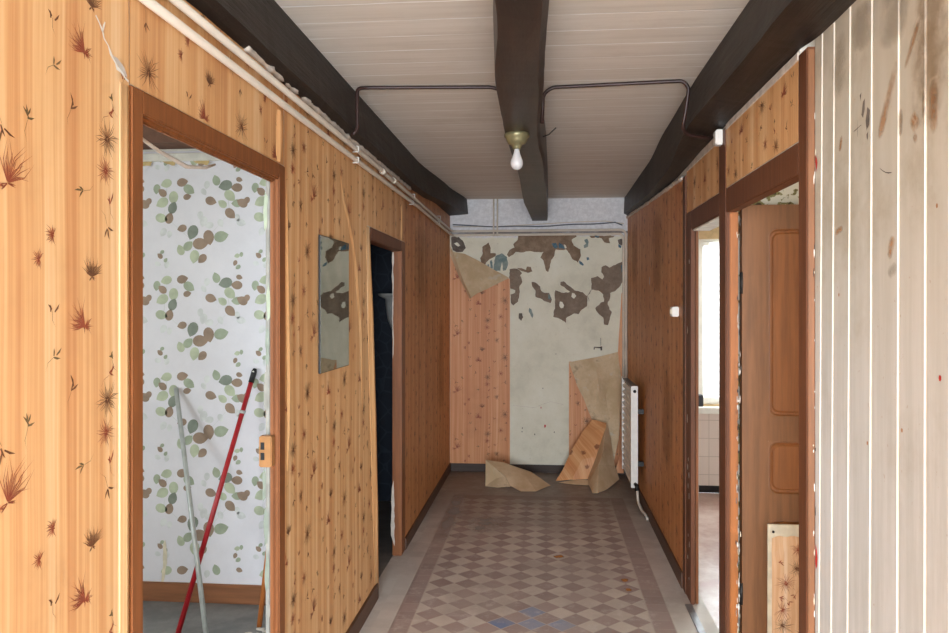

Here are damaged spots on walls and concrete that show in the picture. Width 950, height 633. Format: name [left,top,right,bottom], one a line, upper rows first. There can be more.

peeling [451,236,466,253]
peeling [480,235,622,326]